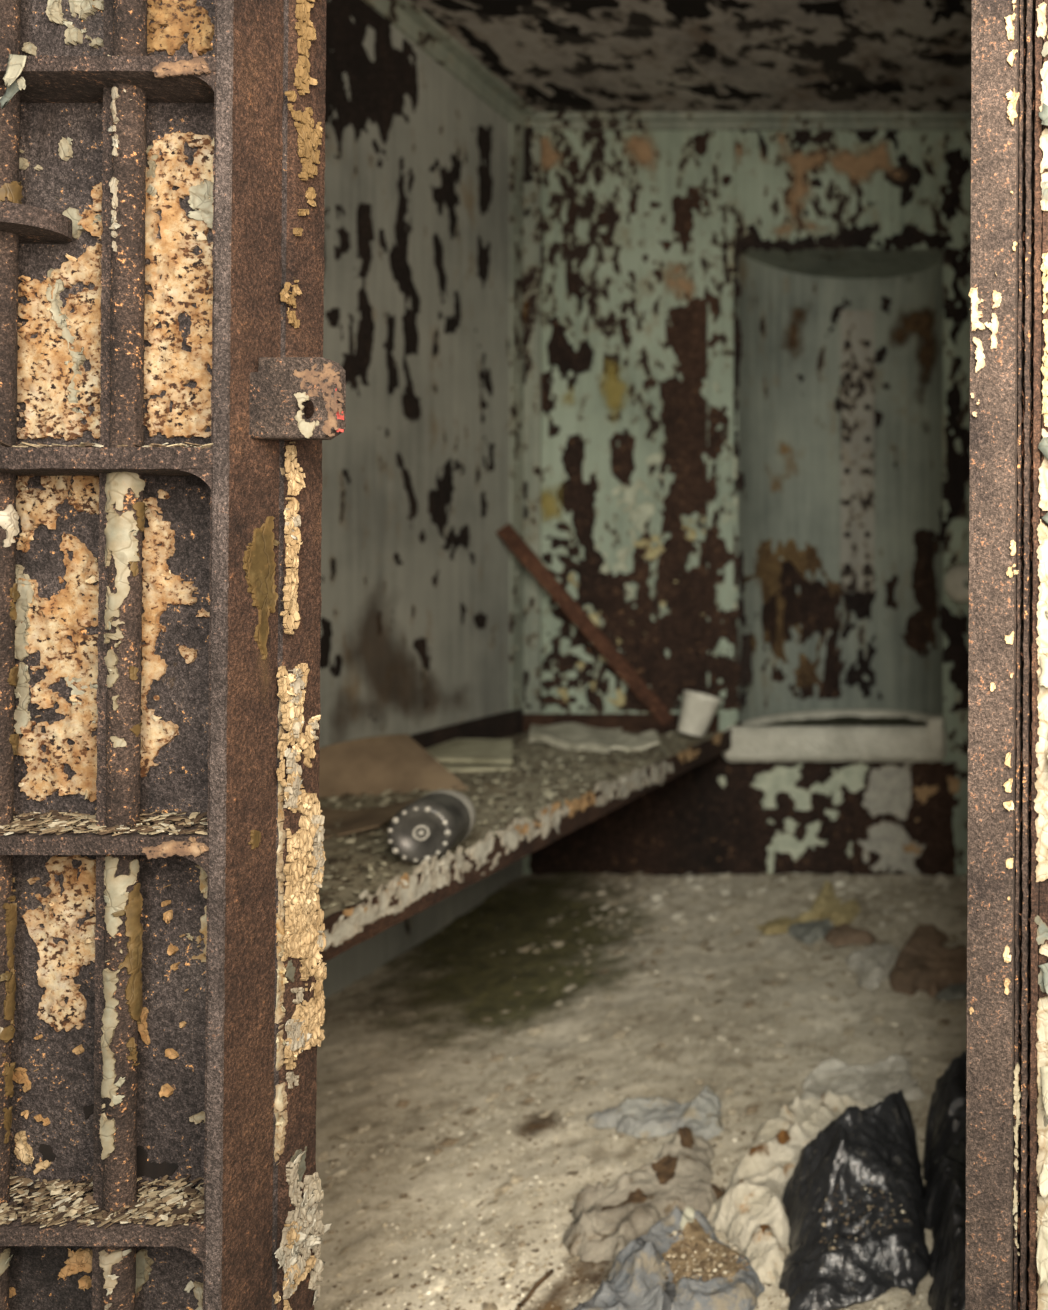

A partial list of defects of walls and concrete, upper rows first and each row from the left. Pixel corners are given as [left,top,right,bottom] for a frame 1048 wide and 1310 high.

peeling [0,42,37,109]
peeling [17,177,121,441]
peeling [45,0,104,49]
peeling [144,131,214,439]
peeling [147,0,215,78]
corrosion [292,362,344,437]
peeling [285,0,421,423]
peeling [524,147,1002,714]
peeling [0,472,210,810]
peeling [0,837,209,1179]
peeling [243,442,960,1310]
peeling [1012,1063,1021,1256]